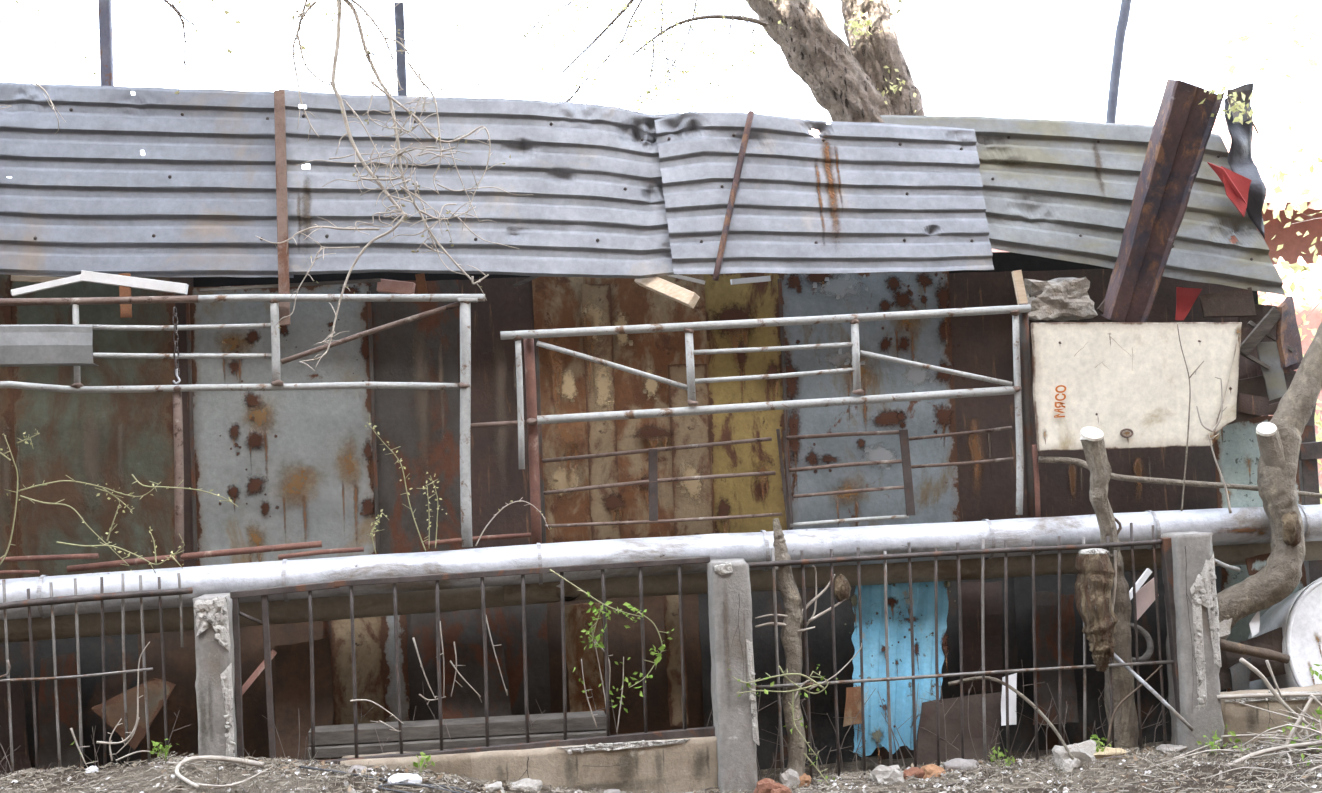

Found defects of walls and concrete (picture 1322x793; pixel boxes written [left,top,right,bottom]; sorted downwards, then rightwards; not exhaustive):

rust [815,140,842,237]
rust [219,329,317,563]
rust [338,440,378,541]
rust [546,327,563,414]
rust [584,309,594,393]
rust [717,497,731,533]
rust [709,303,755,403]
rust [766,340,838,486]
rust [786,274,833,293]
rust [846,359,907,448]
rust [880,273,965,382]
rust [933,404,959,447]